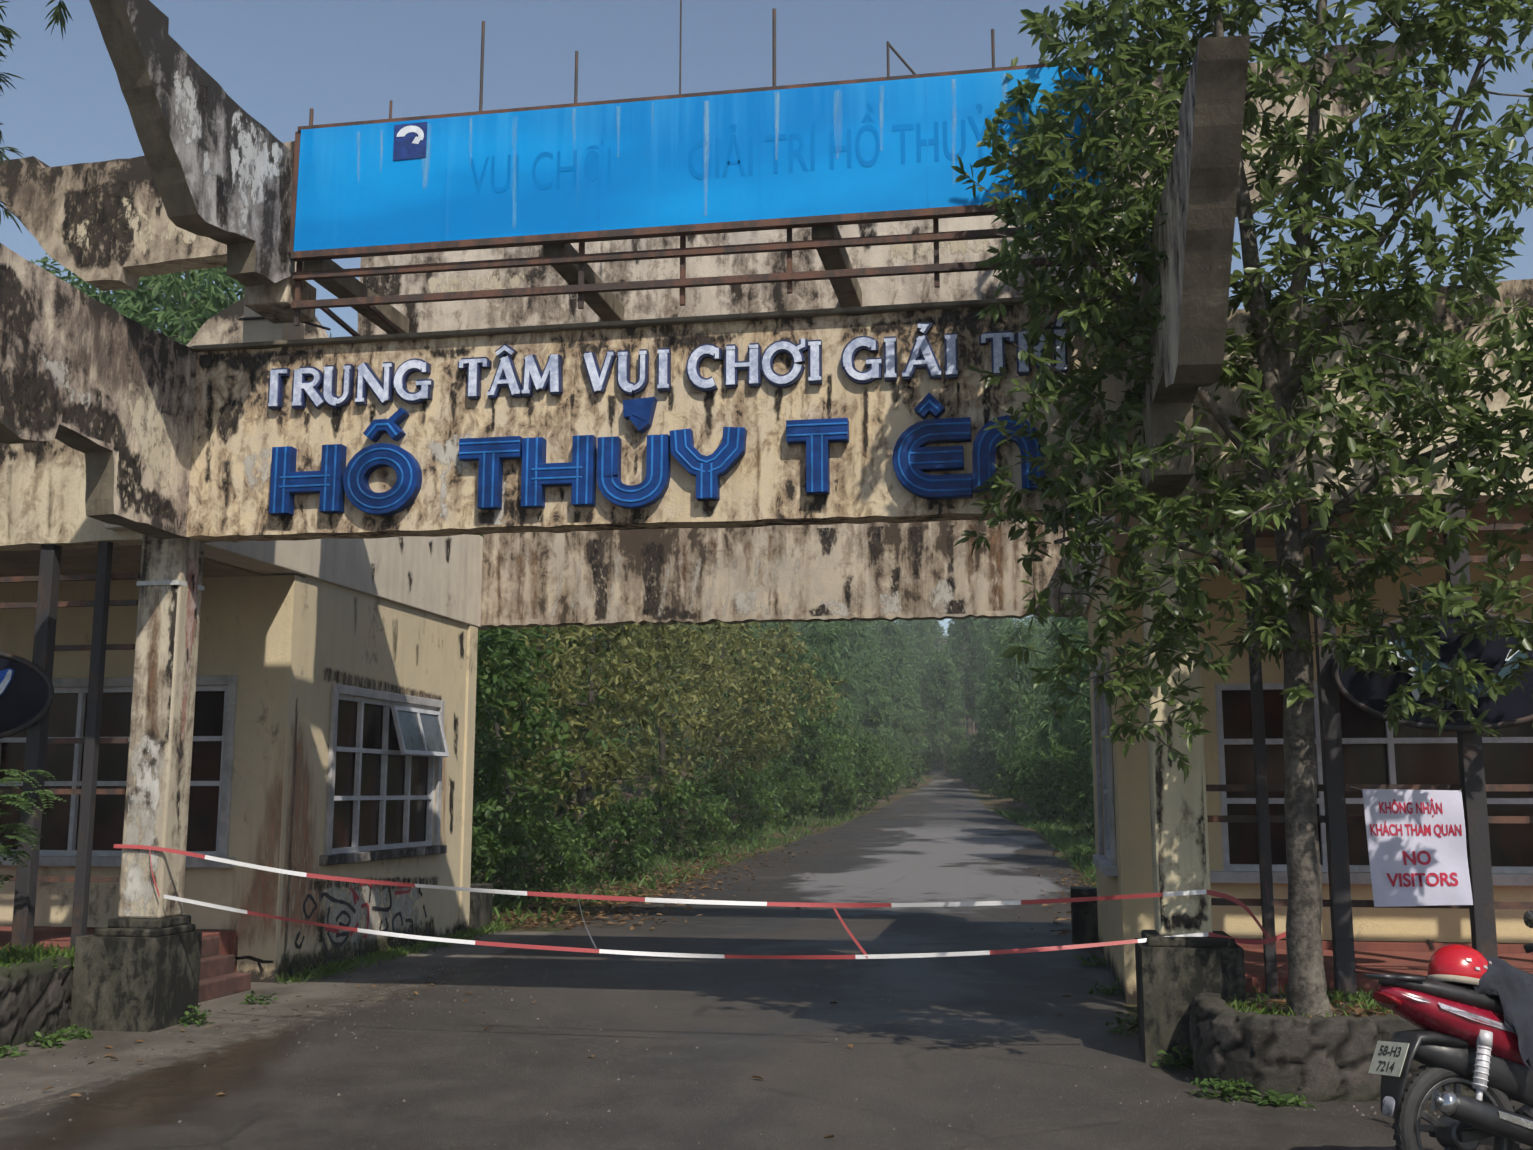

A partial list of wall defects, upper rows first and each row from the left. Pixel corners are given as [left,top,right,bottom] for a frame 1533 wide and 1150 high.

leakage [17,168,162,269]
leakage [216,174,229,228]
leakage [363,274,474,359]
leakage [0,264,177,521]
leakage [331,407,343,437]
leakage [704,391,714,434]
leakage [813,479,838,555]
leakage [576,539,620,621]
leakage [867,526,923,597]
spalling [181,558,199,740]
peeling [124,735,165,916]
rust [234,737,322,937]